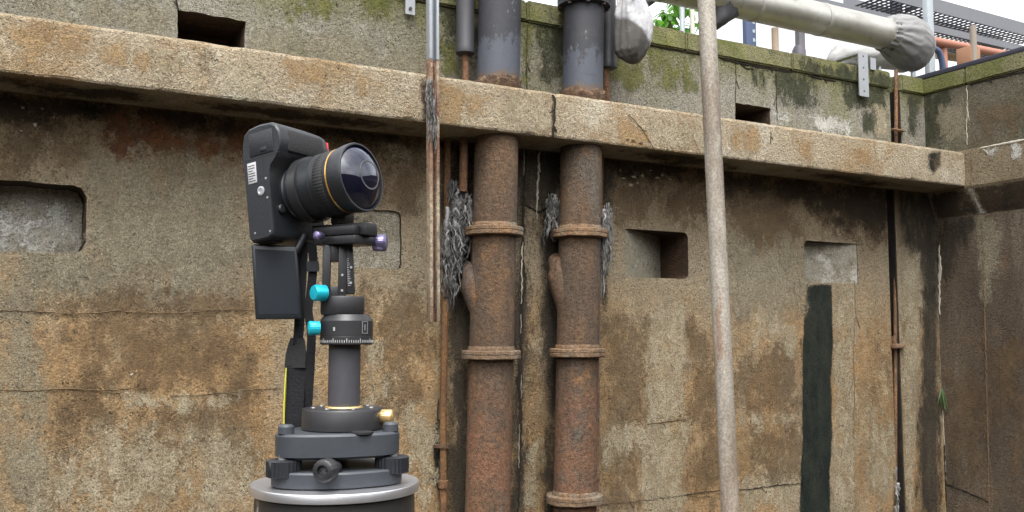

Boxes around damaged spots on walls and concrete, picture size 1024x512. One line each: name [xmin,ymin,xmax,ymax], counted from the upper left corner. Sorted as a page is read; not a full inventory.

corrosion [102,109,252,163]
crack [549,94,557,136]
leakage [809,115,855,136]
leakage [873,105,890,139]
leakage [729,188,1003,512]
crack [0,387,279,397]